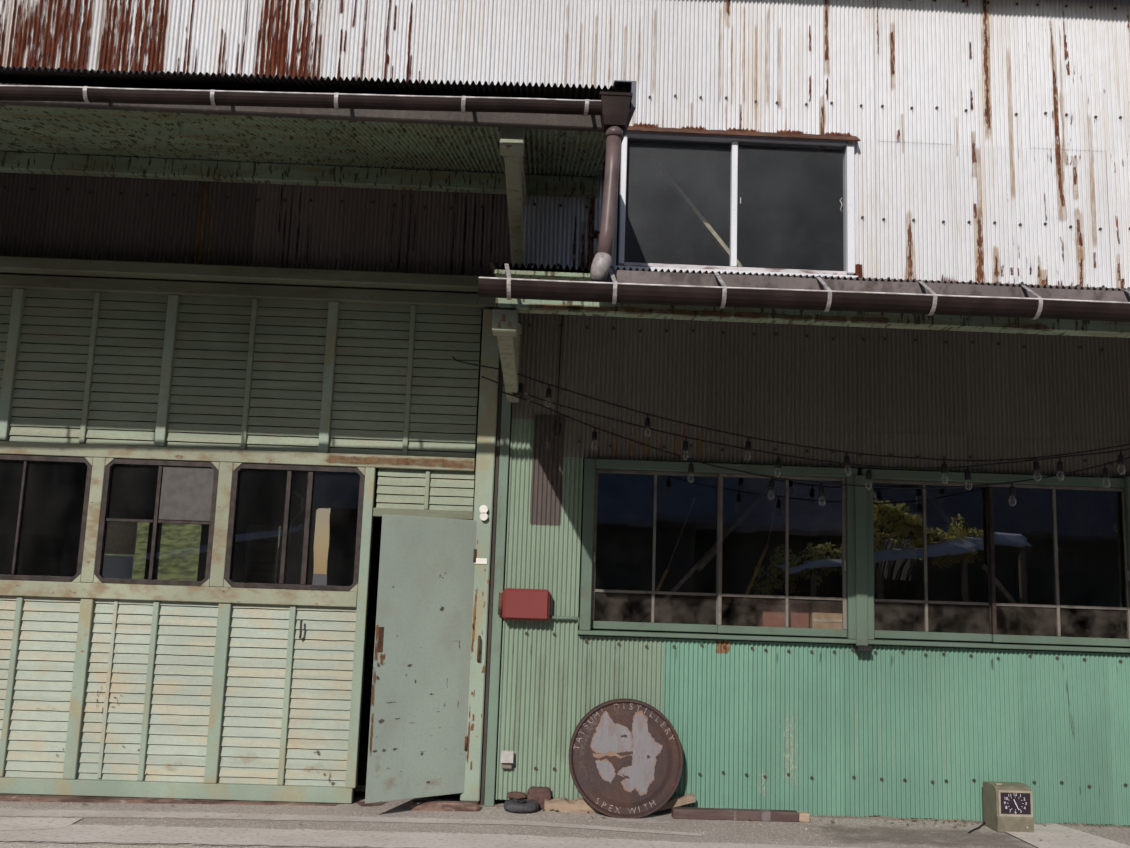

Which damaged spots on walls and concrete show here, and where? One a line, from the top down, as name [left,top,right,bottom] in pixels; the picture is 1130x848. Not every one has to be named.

corrosion [0,0,196,73]
corrosion [217,0,322,79]
corrosion [337,0,368,81]
corrosion [384,0,420,83]
corrosion [970,0,992,128]
corrosion [1045,15,1081,206]
corrosion [573,198,595,270]
corrosion [974,204,1096,286]
peeling [457,570,489,673]
peeling [429,693,482,770]